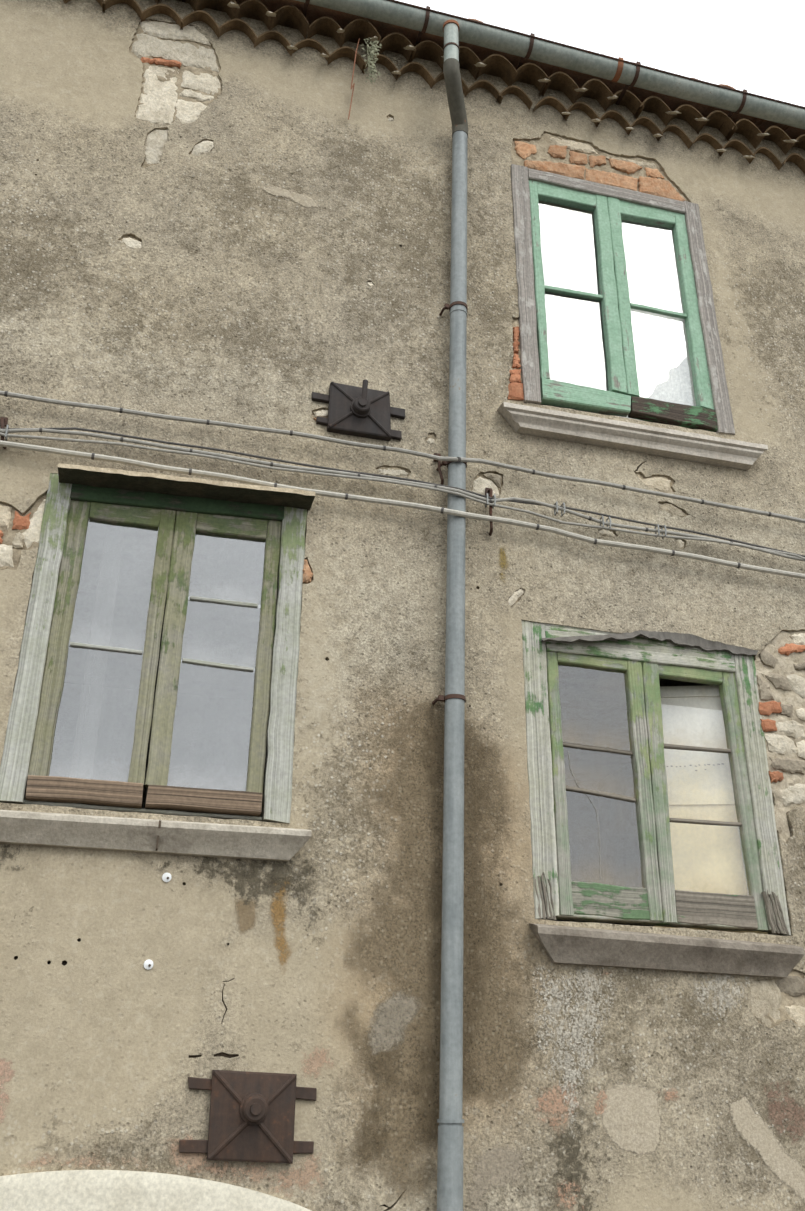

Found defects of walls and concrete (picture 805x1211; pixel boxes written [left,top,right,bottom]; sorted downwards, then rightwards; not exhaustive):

peeling [129,20,222,168]
peeling [511,133,687,201]
peeling [0,494,47,570]
peeling [755,631,805,842]
water stain [236,900,255,932]
water stain [344,702,445,1196]
water stain [463,724,614,1136]
crack [189,978,238,1058]
peeling [748,970,805,1028]